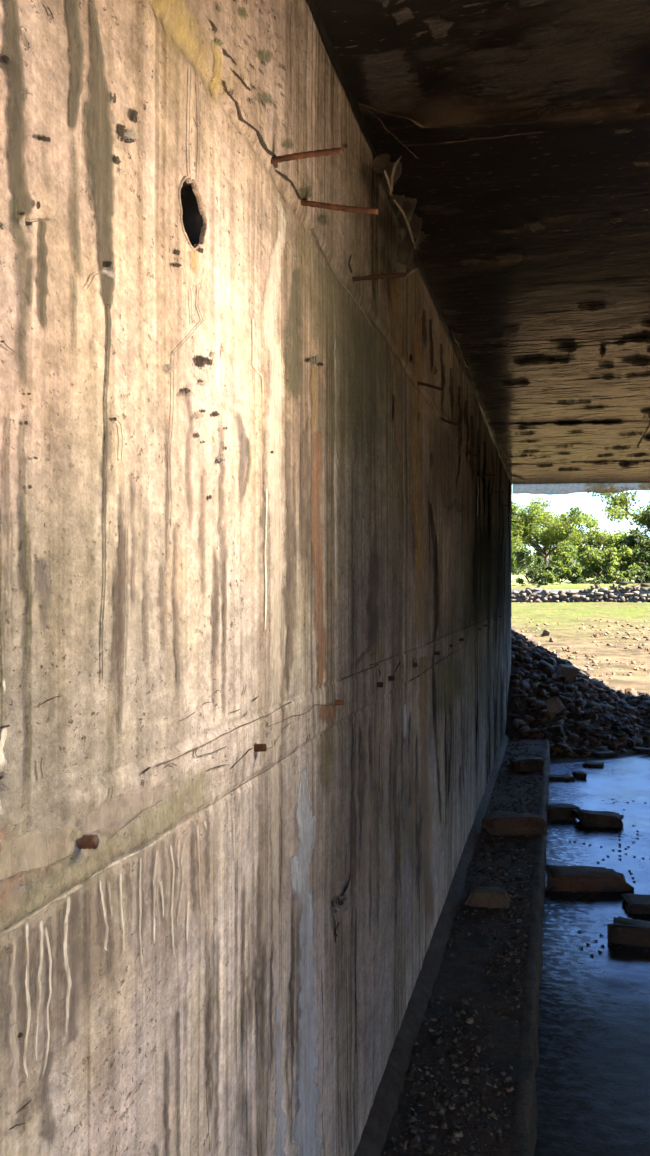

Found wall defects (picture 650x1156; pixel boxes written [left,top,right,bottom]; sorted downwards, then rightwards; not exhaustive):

water stain [3,0,48,375]
water stain [66,0,179,730]
crack [188,21,307,200]
water stain [228,211,324,1156]
rust [311,366,326,688]
crack [142,414,510,813]
rust [320,704,334,786]
crack [311,171,376,330]
peeling [359,49,423,114]
peeling [377,0,453,39]
crack [505,421,650,466]
water stain [0,811,210,1094]